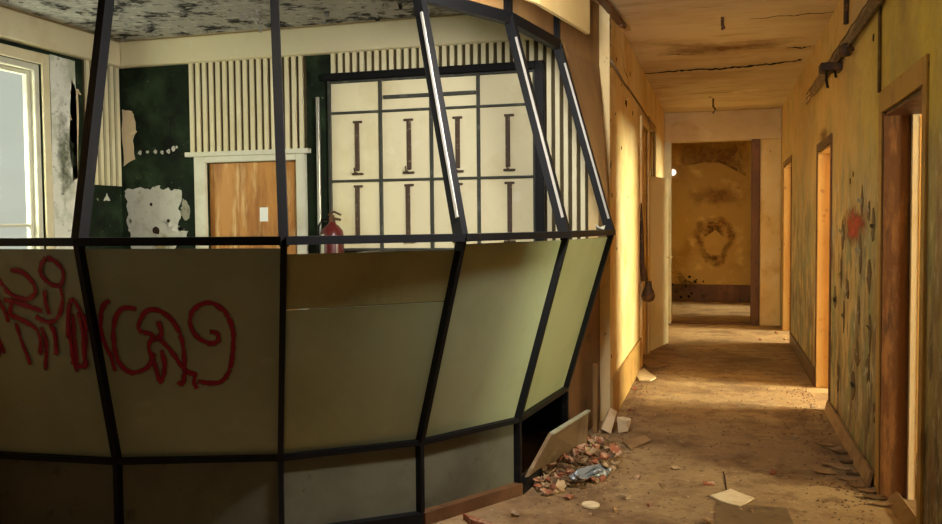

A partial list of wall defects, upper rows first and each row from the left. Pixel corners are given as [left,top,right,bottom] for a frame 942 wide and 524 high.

peeling [125,185,190,249]
leakage [696,218,735,265]